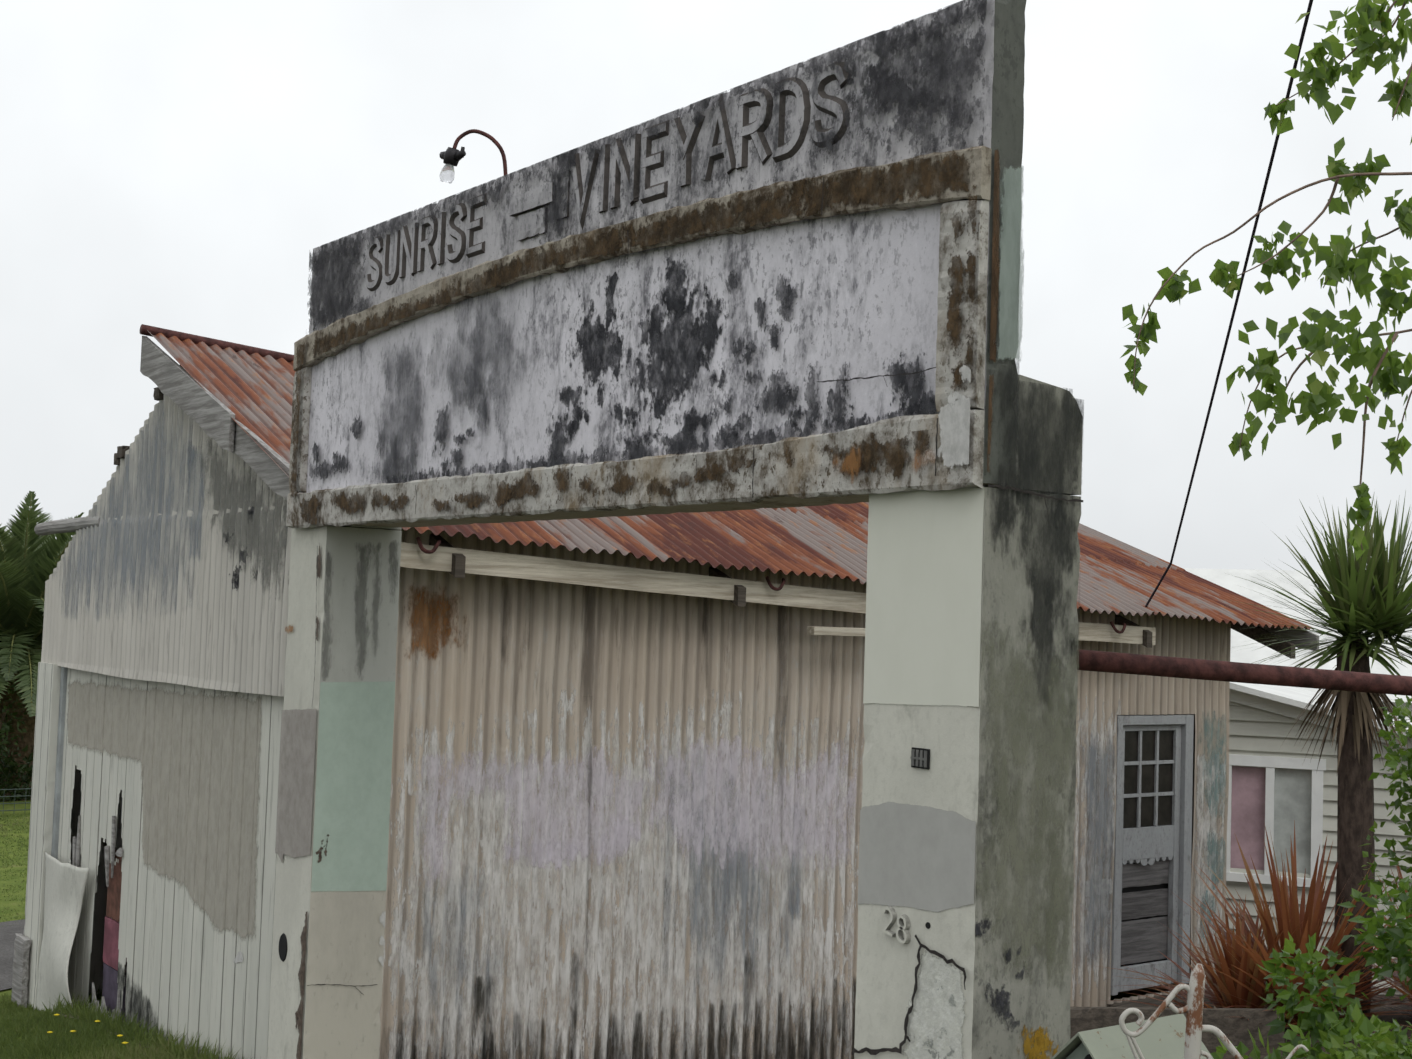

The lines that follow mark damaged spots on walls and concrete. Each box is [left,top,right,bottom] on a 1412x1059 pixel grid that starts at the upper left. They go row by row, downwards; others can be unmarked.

mould [309,287,524,483]
mould [542,257,866,467]
mould [883,352,936,416]
damp [65,412,288,614]
damp [992,361,1084,709]
corrosion [408,586,466,659]
mould [975,918,991,937]
damp [475,977,572,1059]
damp [594,982,856,1059]
crack [851,935,966,1056]
mould [985,946,1029,1031]